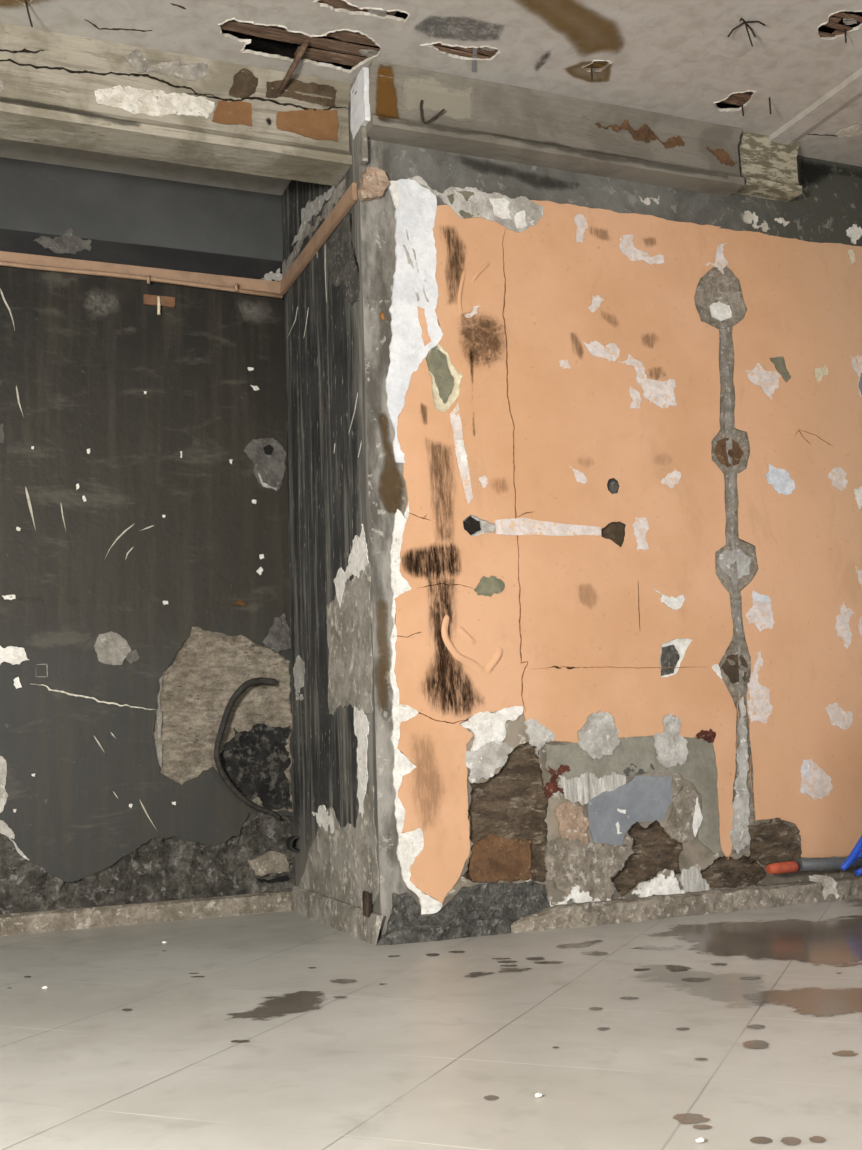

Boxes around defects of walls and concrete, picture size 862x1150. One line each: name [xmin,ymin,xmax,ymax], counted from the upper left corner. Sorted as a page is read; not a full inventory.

water stain [519,0,622,82]
water stain [432,447,450,516]
water stain [404,531,474,714]
peeling [474,576,505,597]
peeling [653,588,685,610]
peeling [745,591,775,632]
flaking render [660,638,693,677]
flaking render [0,524,379,914]
flaking render [390,502,443,914]
flaking render [460,651,802,907]
peeling [799,759,833,800]
flaking render [809,875,840,900]